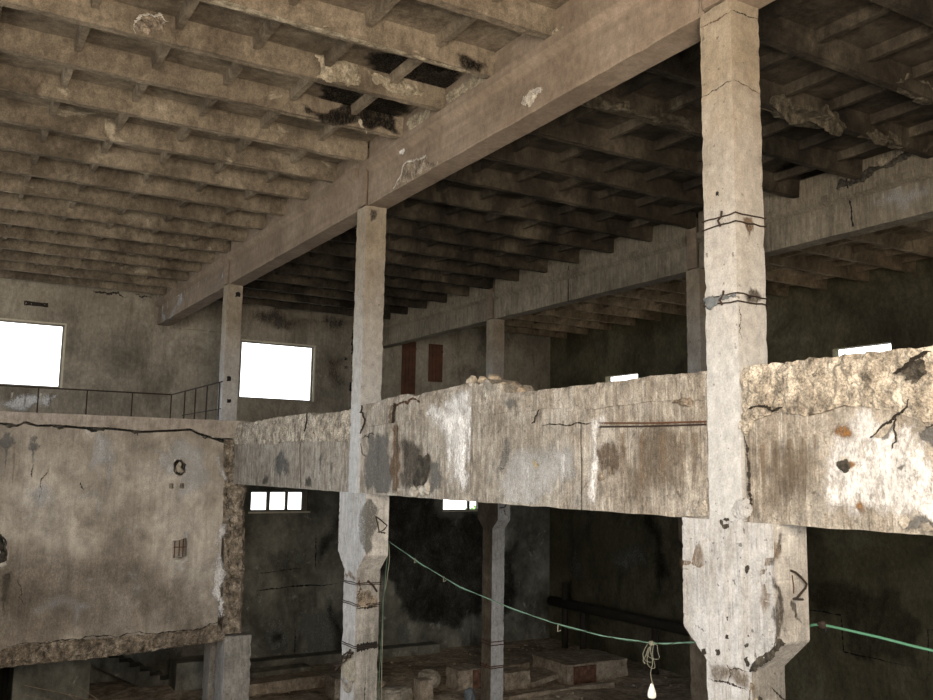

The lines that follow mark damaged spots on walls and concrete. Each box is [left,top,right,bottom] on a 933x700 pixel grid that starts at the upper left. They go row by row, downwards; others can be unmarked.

peeling [199,0,486,104]
spalling [760,94,847,136]
spalling [836,129,912,190]
crack [6,421,142,435]
crack [171,428,227,442]
rust [390,426,400,493]
spalling [738,346,933,505]
crack [870,399,909,448]
spalling [0,371,707,668]
leakage [359,391,483,644]
peeling [899,514,933,534]
leakage [504,554,516,614]